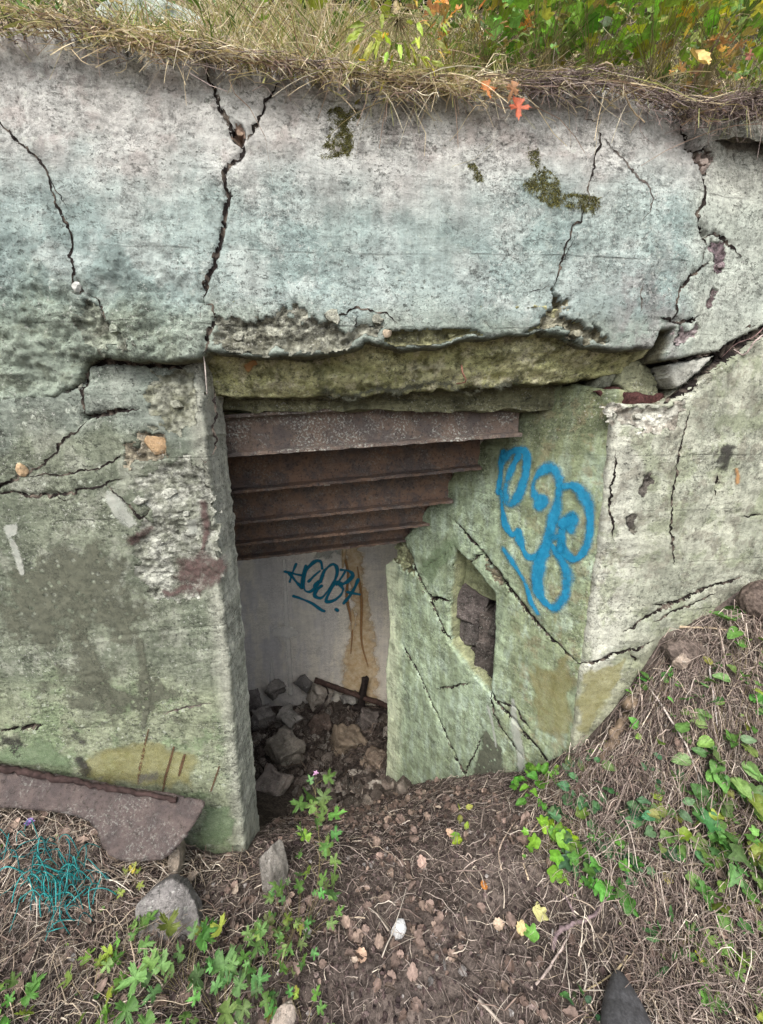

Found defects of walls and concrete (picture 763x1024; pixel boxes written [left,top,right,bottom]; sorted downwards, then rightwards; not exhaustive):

crack [528,103,654,292]
crack [640,120,742,325]
crack [0,69,280,520]
spalling [212,303,483,358]
spalling [528,288,608,346]
spalling [670,324,699,346]
crack [608,454,618,537]
crack [663,324,763,564]
water stain [317,548,379,703]
crack [456,522,740,665]
rust [162,747,186,792]
crack [404,648,549,776]